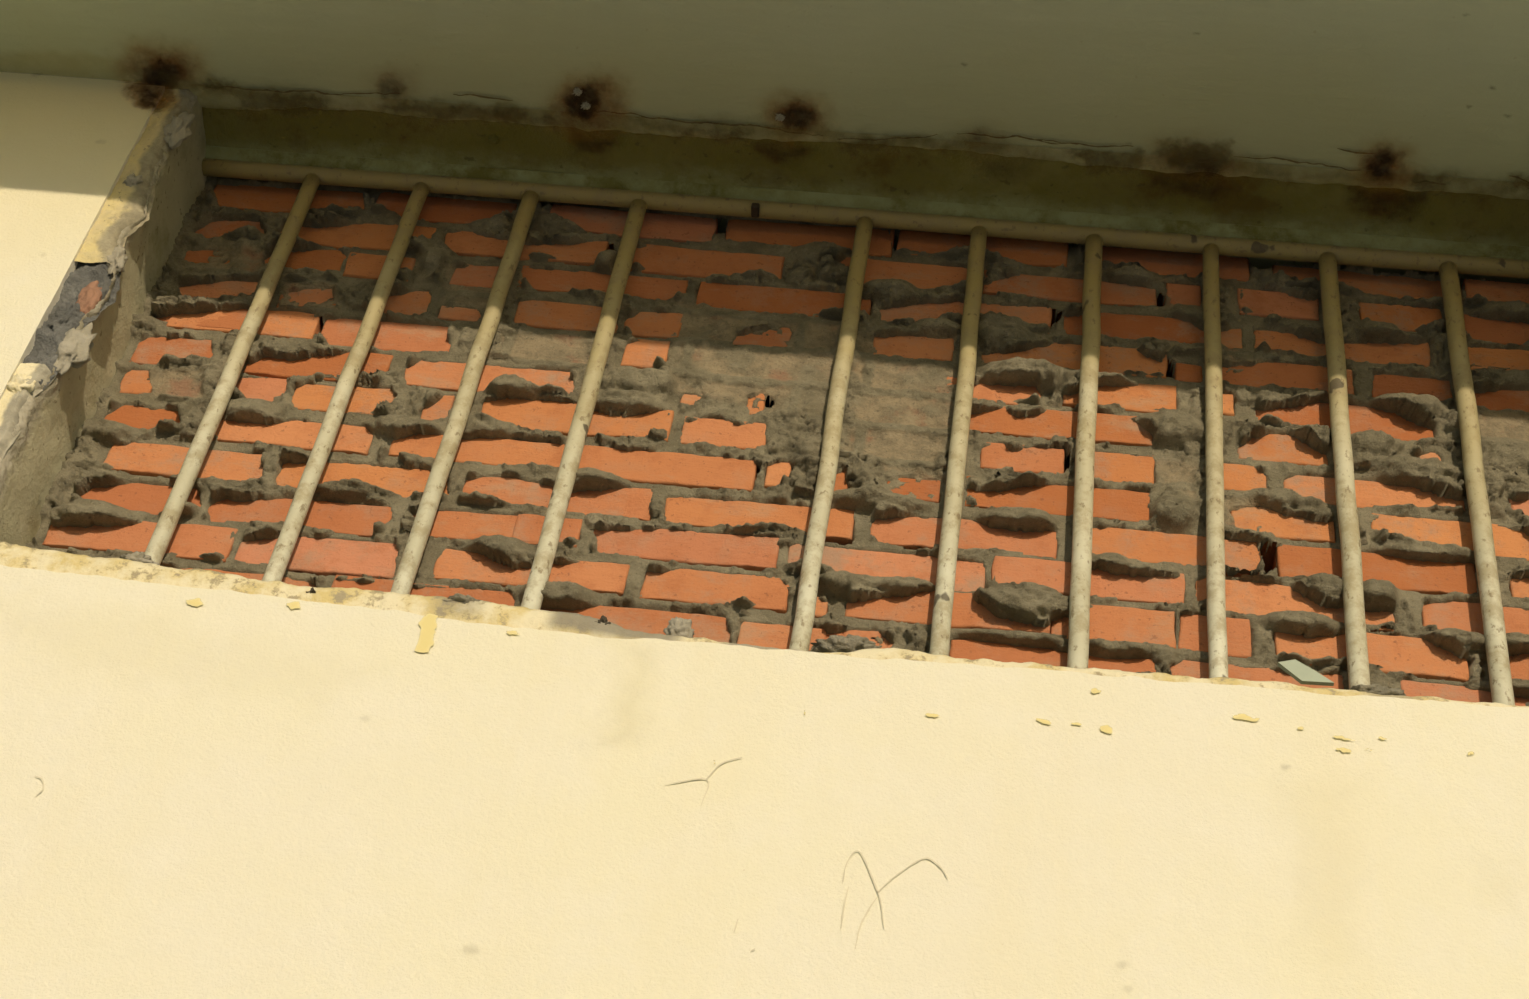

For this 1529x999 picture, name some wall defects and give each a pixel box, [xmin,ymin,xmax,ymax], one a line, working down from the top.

corrosion [127,51,192,108]
corrosion [564,83,618,150]
spalling [0,87,197,462]
spalling [0,542,1529,707]